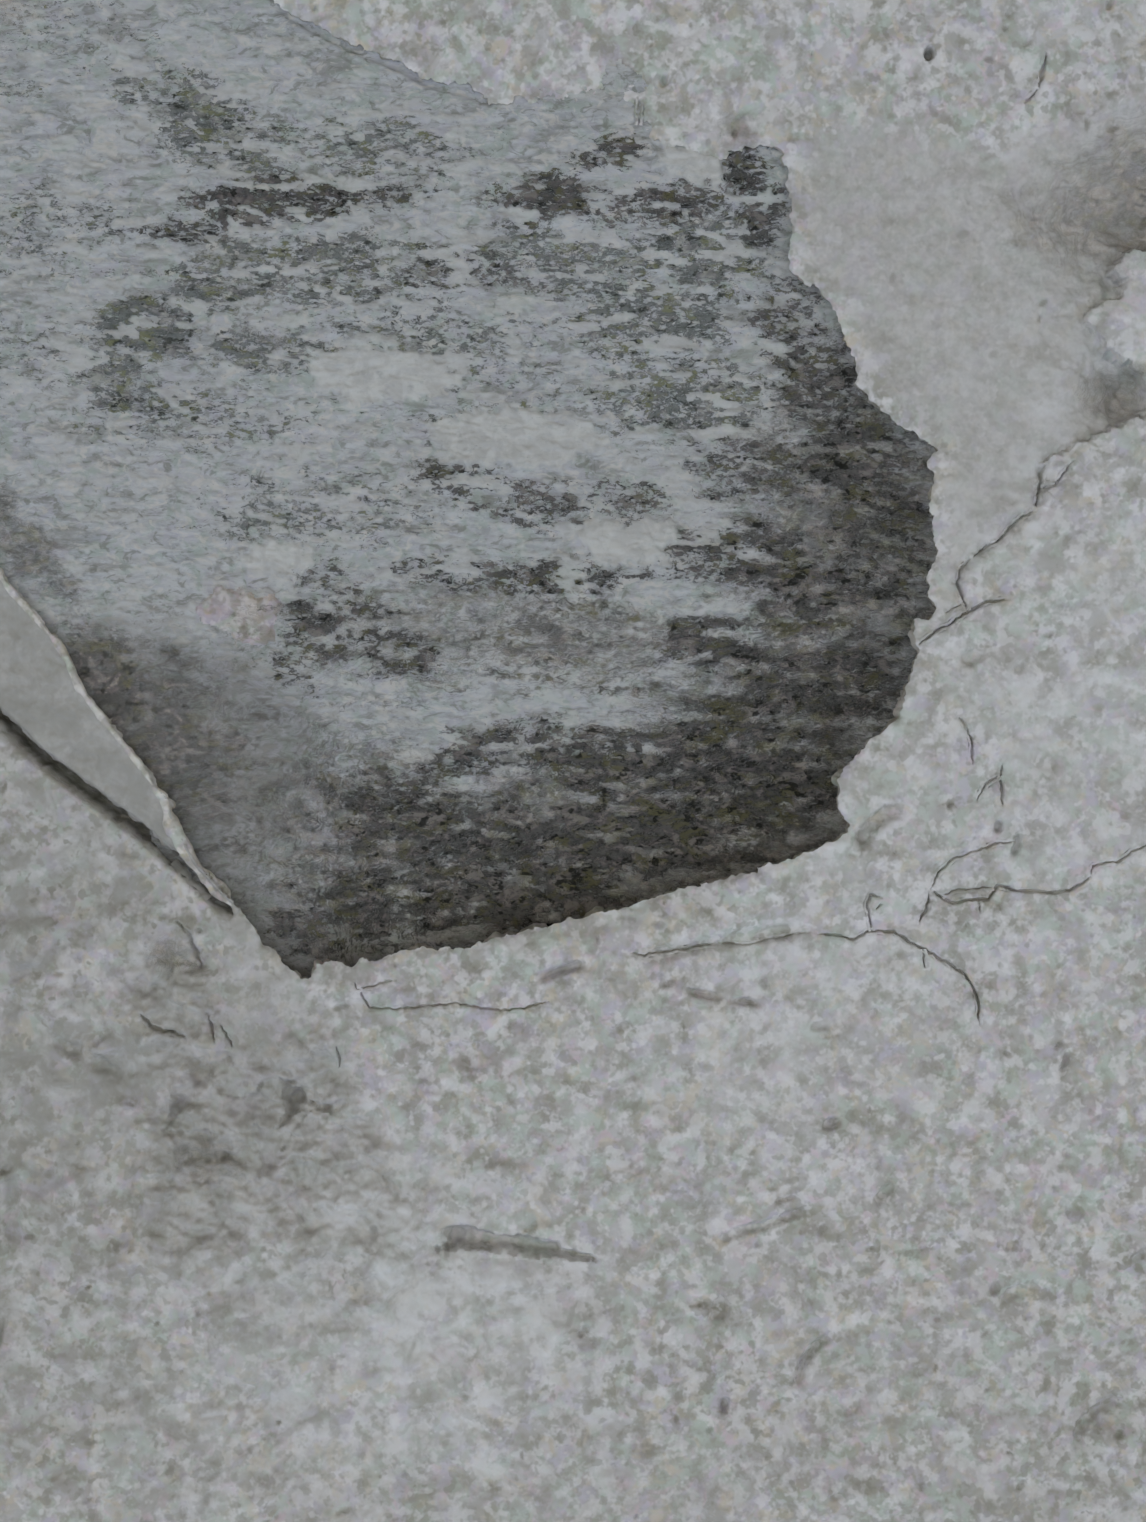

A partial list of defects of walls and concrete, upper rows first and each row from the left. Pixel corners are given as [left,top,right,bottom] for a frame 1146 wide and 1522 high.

leakage [0,0,934,969]
spalling [0,0,1146,979]
crack [916,458,1077,647]
crack [630,716,1146,1026]
flaking render [533,956,588,985]
flaking render [686,981,762,1011]
flaking render [44,1028,131,1084]
flaking render [120,909,406,1255]
flaking render [1055,1050,1076,1077]
flaking render [819,1112,844,1136]
flaking render [712,1197,815,1251]